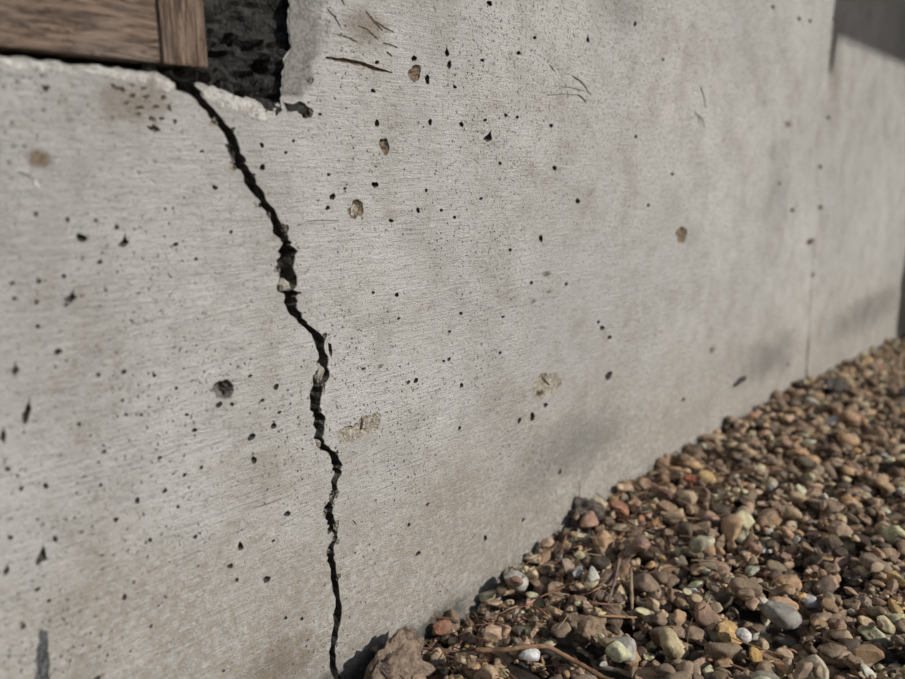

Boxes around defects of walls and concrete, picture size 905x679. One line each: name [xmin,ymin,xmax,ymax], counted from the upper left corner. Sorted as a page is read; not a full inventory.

crack [162,66,342,679]